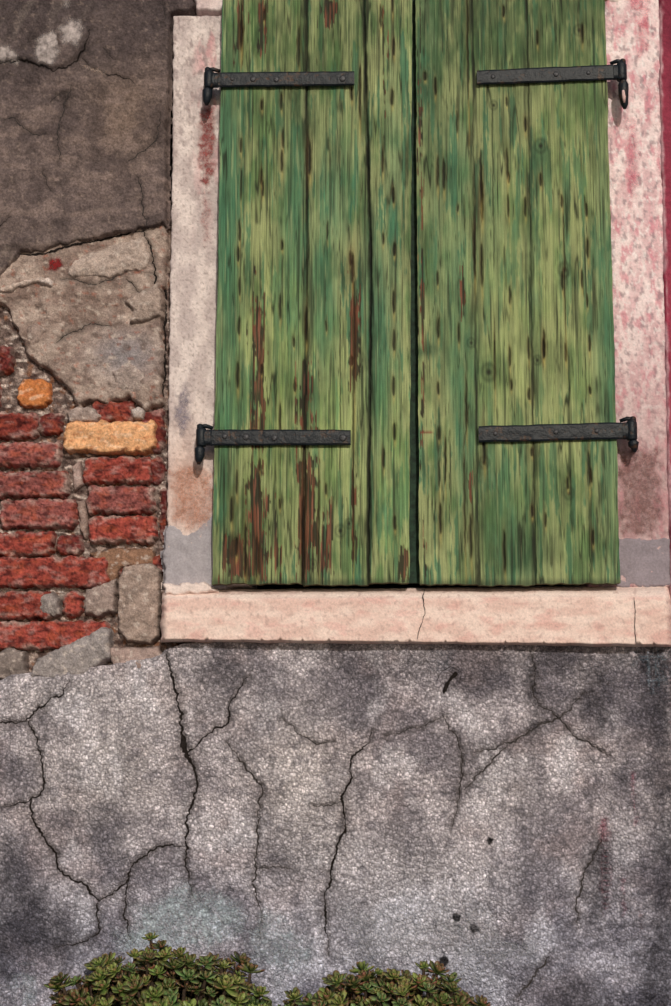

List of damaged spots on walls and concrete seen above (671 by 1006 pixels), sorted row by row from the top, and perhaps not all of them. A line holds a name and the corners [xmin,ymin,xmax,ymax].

crack [0,29,134,191]
crack [22,111,167,397]
spalling [0,218,189,680]
crack [0,654,286,947]
crack [282,651,609,957]